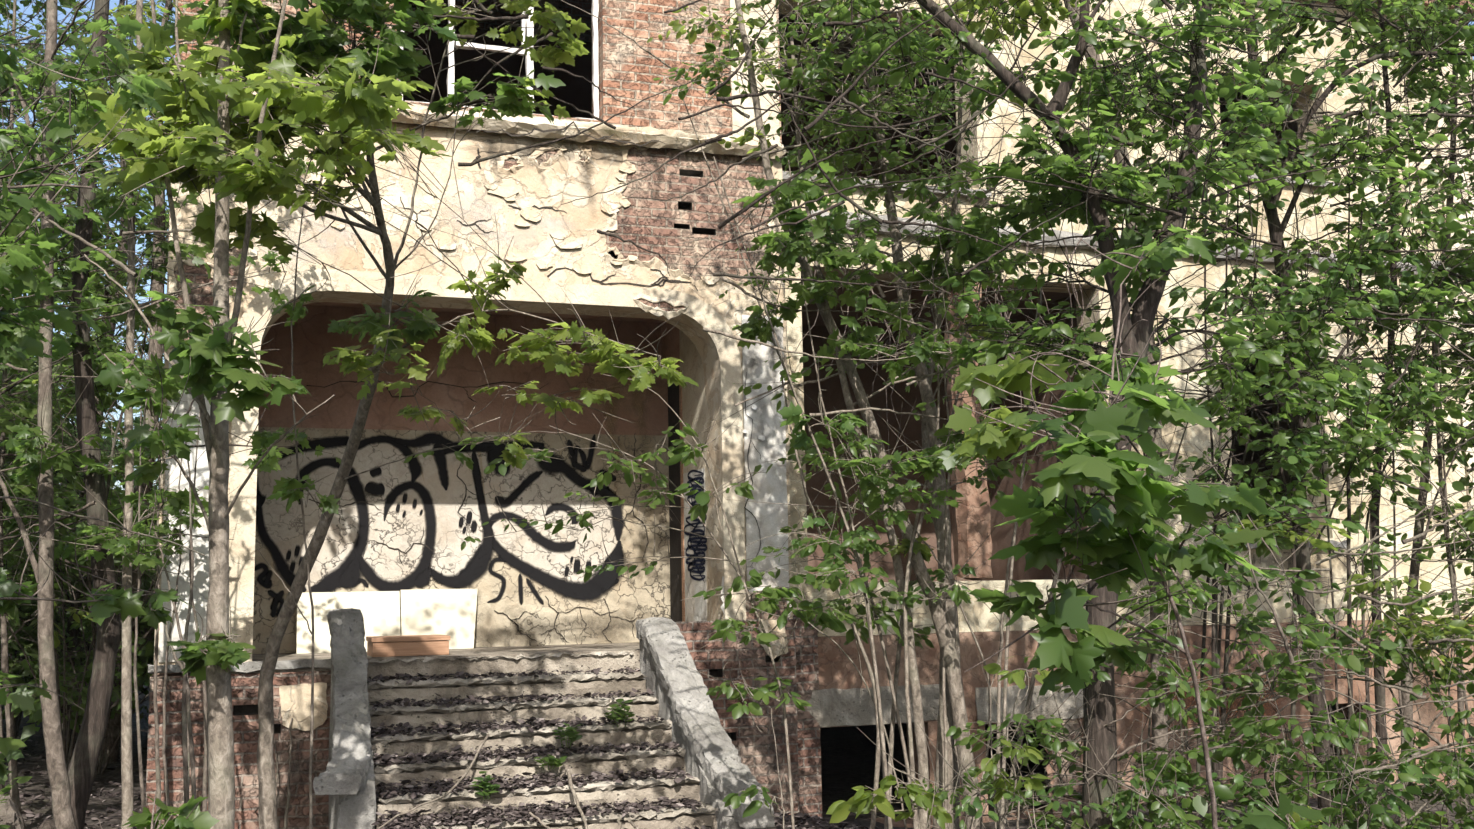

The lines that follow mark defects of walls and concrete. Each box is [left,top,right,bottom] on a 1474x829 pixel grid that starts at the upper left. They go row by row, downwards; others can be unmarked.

spalling [484,141,781,319]